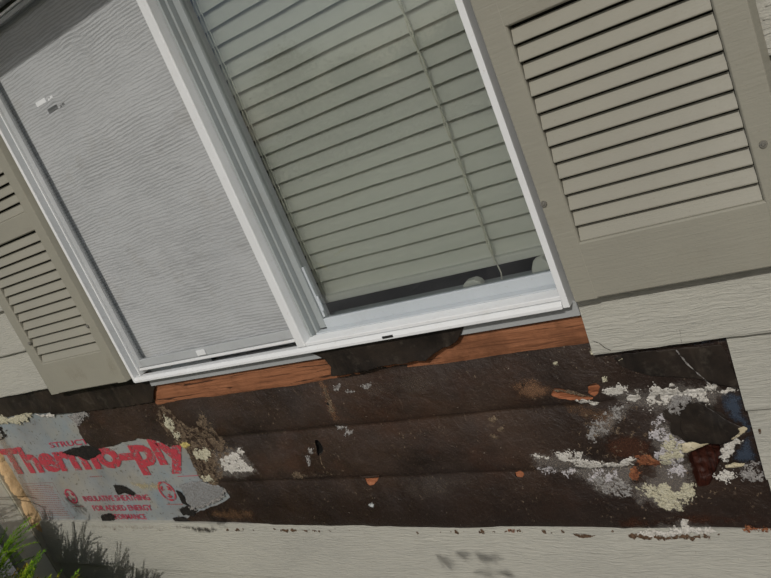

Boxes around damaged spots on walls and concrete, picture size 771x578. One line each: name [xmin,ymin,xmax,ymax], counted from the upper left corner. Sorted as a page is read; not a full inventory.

peeling [0,413,55,426]
peeling [67,411,90,426]
peeling [63,445,101,460]
leakage [607,437,649,461]
peeling [531,345,765,541]
peeling [157,404,254,522]
peeling [113,485,135,496]